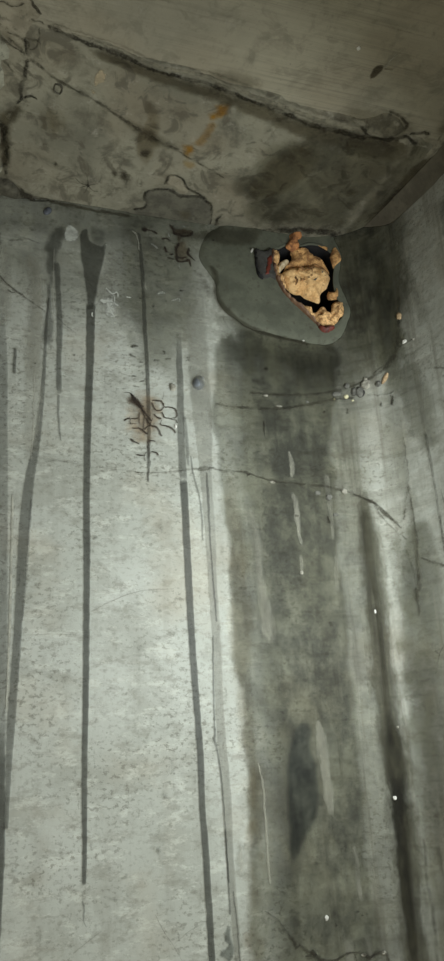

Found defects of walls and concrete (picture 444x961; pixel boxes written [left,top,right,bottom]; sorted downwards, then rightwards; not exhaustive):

crack [0,33,224,225]
crack [0,0,430,145]
water stain [65,225,78,241]
water stain [6,495,14,708]
water stain [190,349,241,961]
water stain [393,775,418,919]
crack [265,911,389,961]